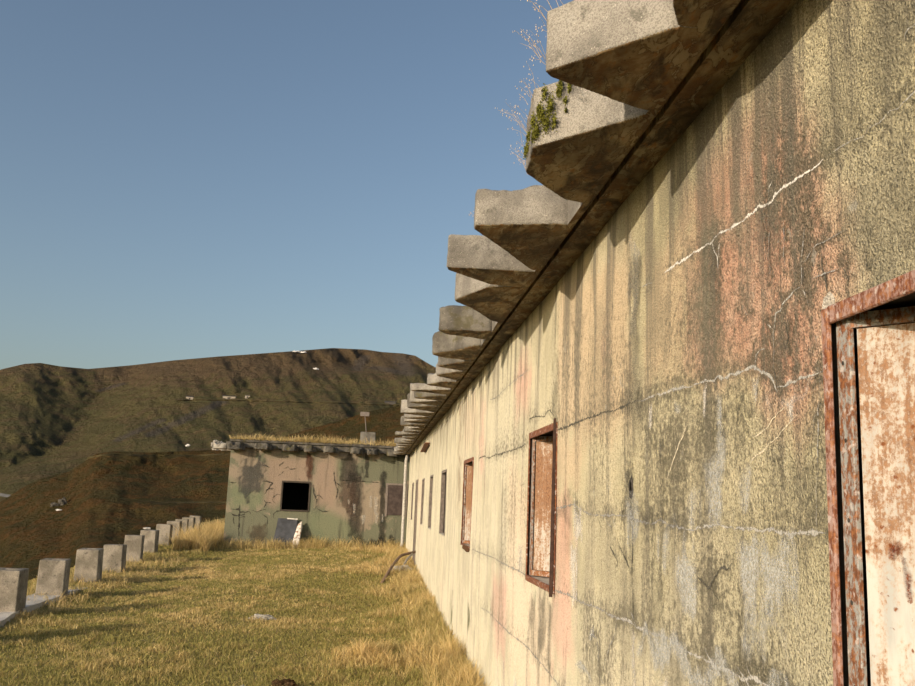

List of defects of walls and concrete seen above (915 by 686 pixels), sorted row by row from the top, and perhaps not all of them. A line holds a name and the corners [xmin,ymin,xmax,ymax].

water stain [626,259,651,431]
crack [530,91,915,568]
water stain [238,455,263,501]
water stain [339,452,395,547]
crack [698,563,732,600]
crack [555,590,774,686]